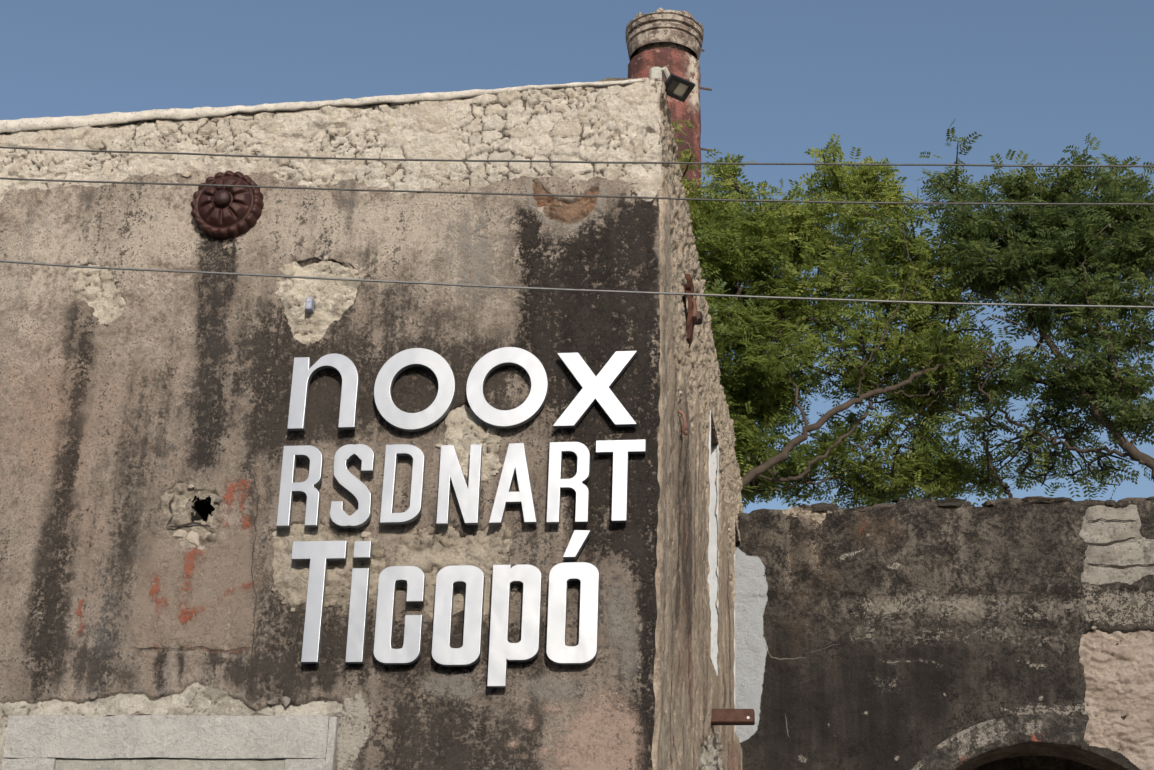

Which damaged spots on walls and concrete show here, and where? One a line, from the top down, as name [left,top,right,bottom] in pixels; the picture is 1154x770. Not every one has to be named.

spalling [0,78,744,601]
water stain [25,304,184,703]
spalling [271,520,512,619]
water stain [186,194,708,770]
water stain [849,583,1154,649]
flaking render [1079,504,1154,585]
spalling [0,682,345,770]
water stain [1001,703,1085,715]
spalling [1079,626,1154,770]